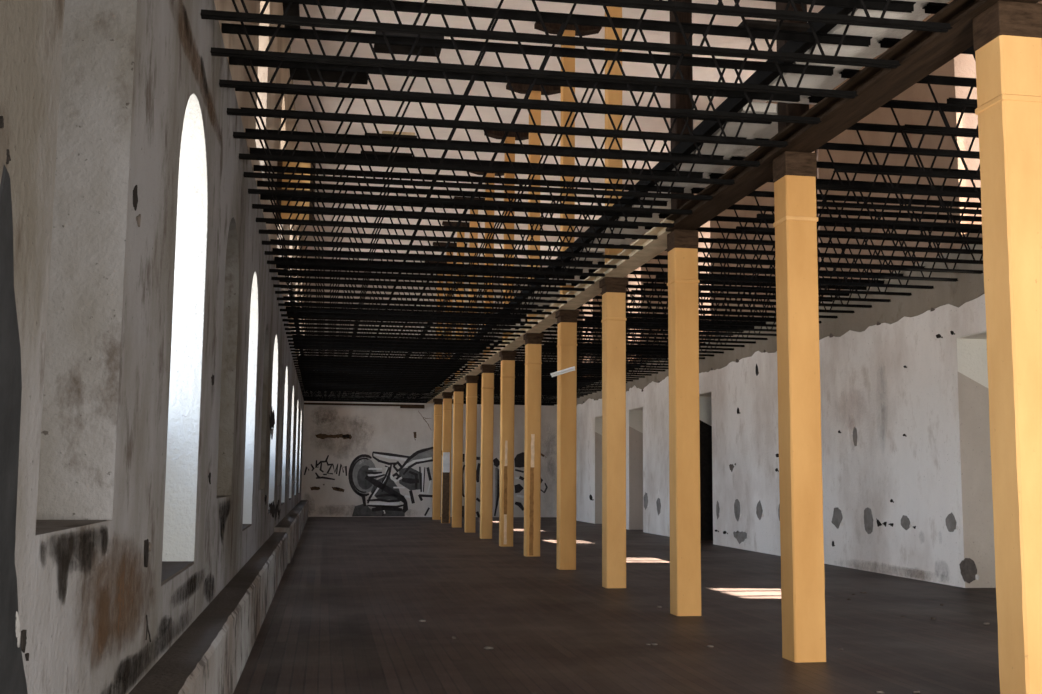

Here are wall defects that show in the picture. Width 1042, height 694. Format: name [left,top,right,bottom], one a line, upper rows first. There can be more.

spalling [831,507,844,528]
spalling [864,507,916,534]
spalling [945,512,959,532]
water stain [41,528,108,602]
water stain [173,573,214,602]
spalling [15,611,29,661]
water stain [102,618,187,694]